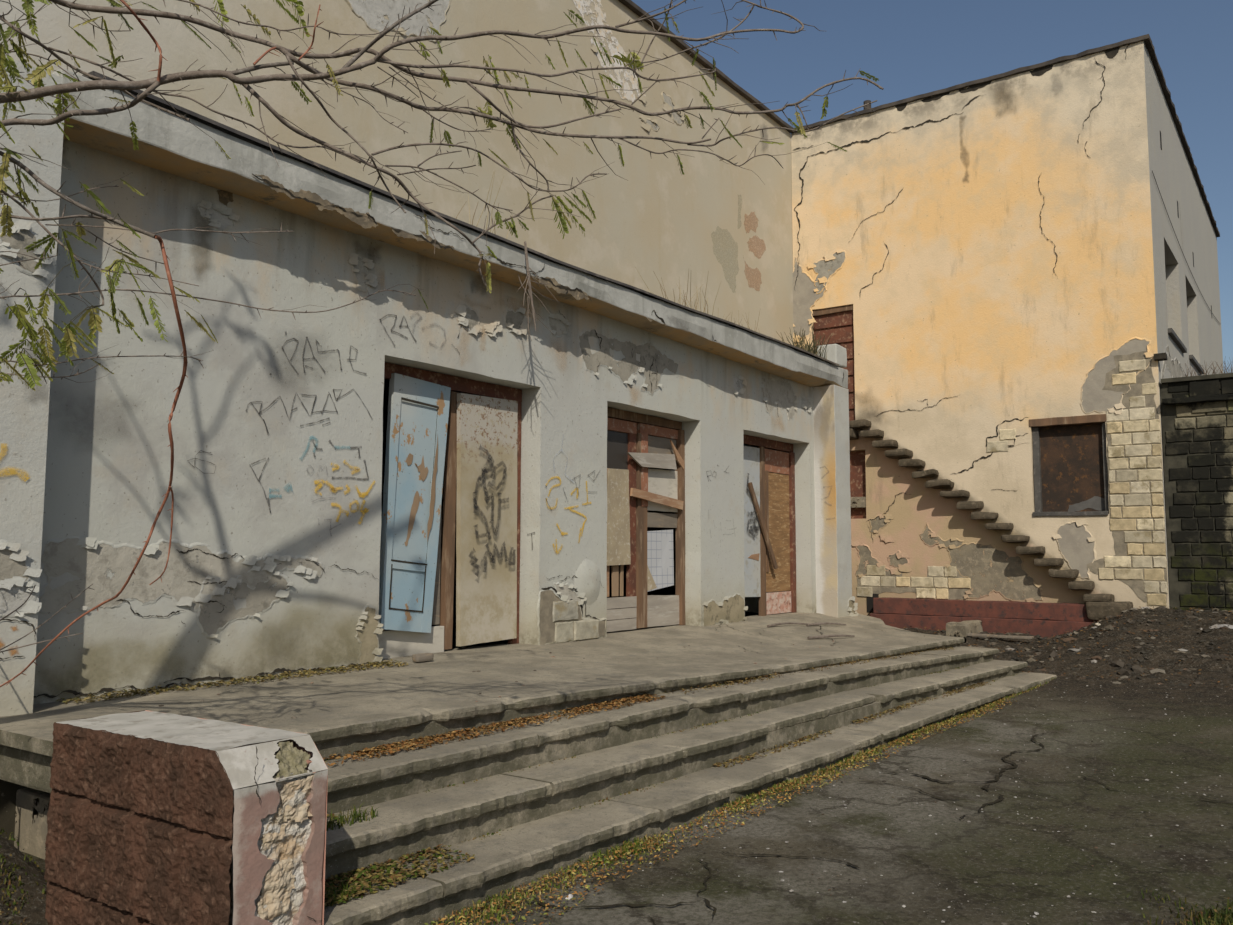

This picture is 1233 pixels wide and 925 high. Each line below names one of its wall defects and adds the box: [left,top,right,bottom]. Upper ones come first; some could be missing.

crack [1078,44,1130,157]
spalling [255,174,454,249]
crack [794,94,986,290]
crack [1038,176,1058,278]
flaking render [793,249,847,342]
flaking render [578,327,679,396]
flaking render [1080,337,1186,414]
crack [952,417,1028,474]
flaking render [0,536,325,639]
flaking render [919,522,1043,602]
flaking render [1052,519,1097,580]
spalling [254,741,314,925]